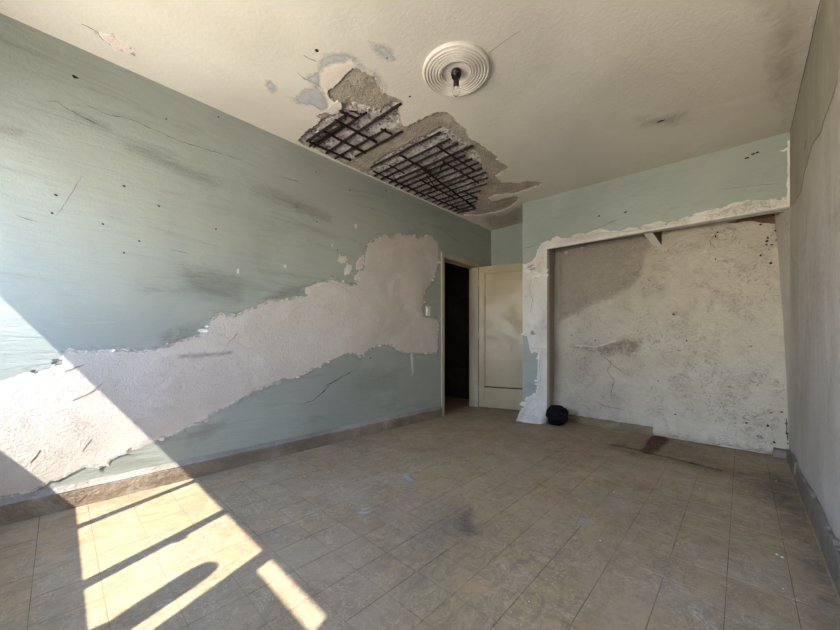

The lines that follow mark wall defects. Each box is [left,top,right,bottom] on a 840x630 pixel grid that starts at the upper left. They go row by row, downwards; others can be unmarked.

spalling [295,49,542,216]
peeling [516,0,840,424]
peeling [0,232,441,499]